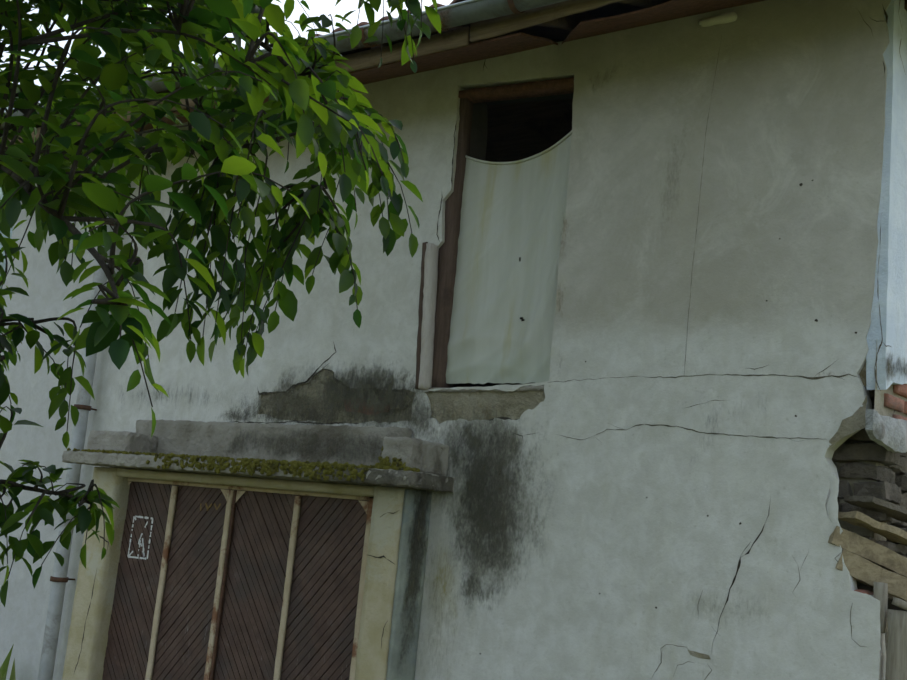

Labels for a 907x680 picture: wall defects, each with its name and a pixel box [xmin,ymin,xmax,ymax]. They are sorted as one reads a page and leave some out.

crack [548,36,891,391]
peeling [258,369,545,424]
crack [512,400,819,443]
spalling [829,346,907,447]
leakage [886,358,907,377]
leakage [457,427,519,567]
peeling [826,474,843,534]
crack [711,499,771,653]